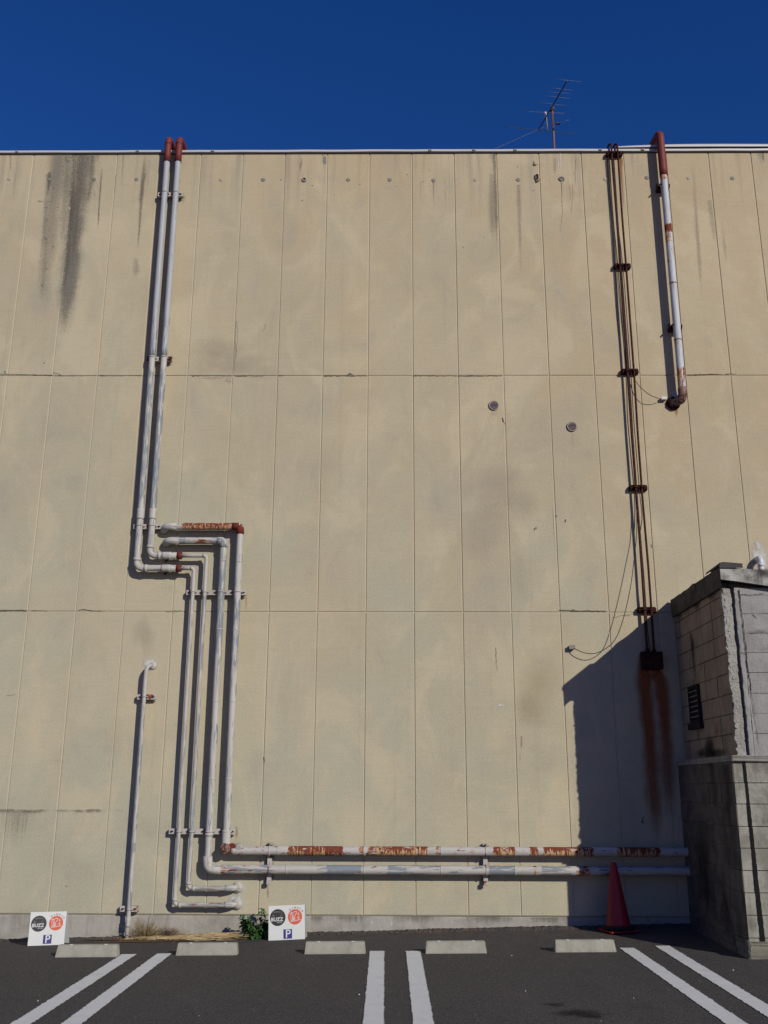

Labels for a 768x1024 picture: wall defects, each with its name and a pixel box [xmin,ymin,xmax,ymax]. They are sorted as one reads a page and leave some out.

rust [638,662,671,809]